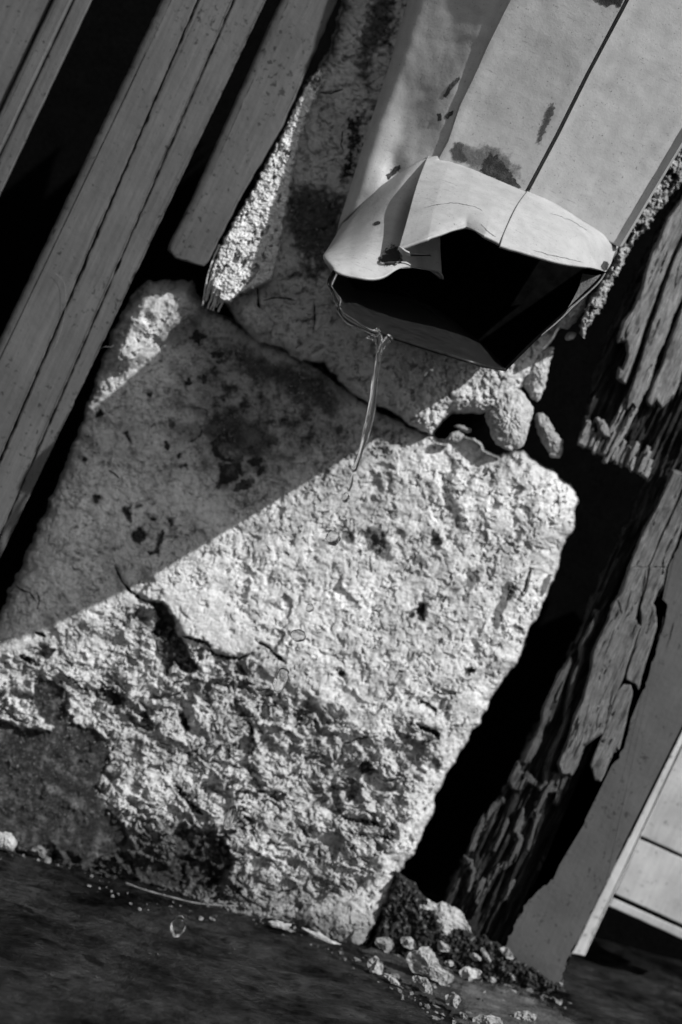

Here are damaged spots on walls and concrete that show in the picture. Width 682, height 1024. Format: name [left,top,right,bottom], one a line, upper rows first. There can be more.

crack [115,566,148,602]
crack [182,636,284,662]